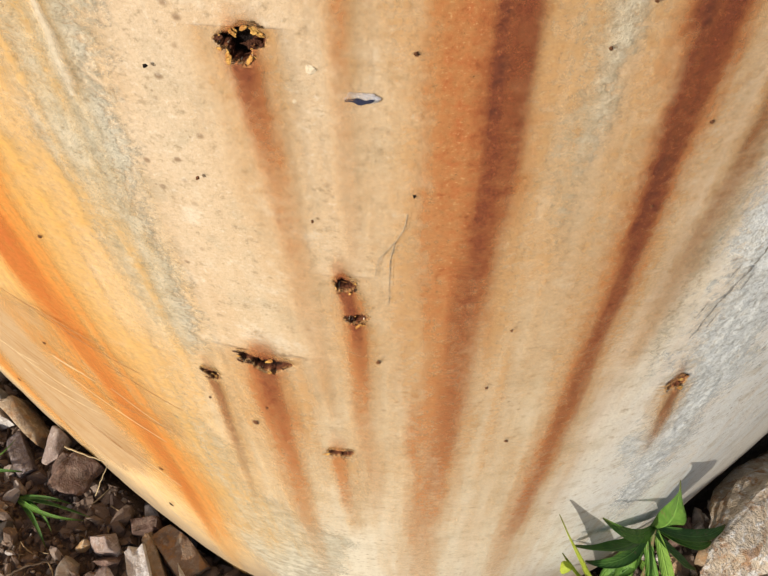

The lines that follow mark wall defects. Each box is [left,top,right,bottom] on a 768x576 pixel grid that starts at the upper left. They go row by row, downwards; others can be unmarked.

rust [210,28,287,197]
rust [0,124,264,537]
rust [230,346,320,516]
rust [328,446,360,501]
rust [321,273,377,419]
rust [380,0,605,529]
rust [510,0,768,526]